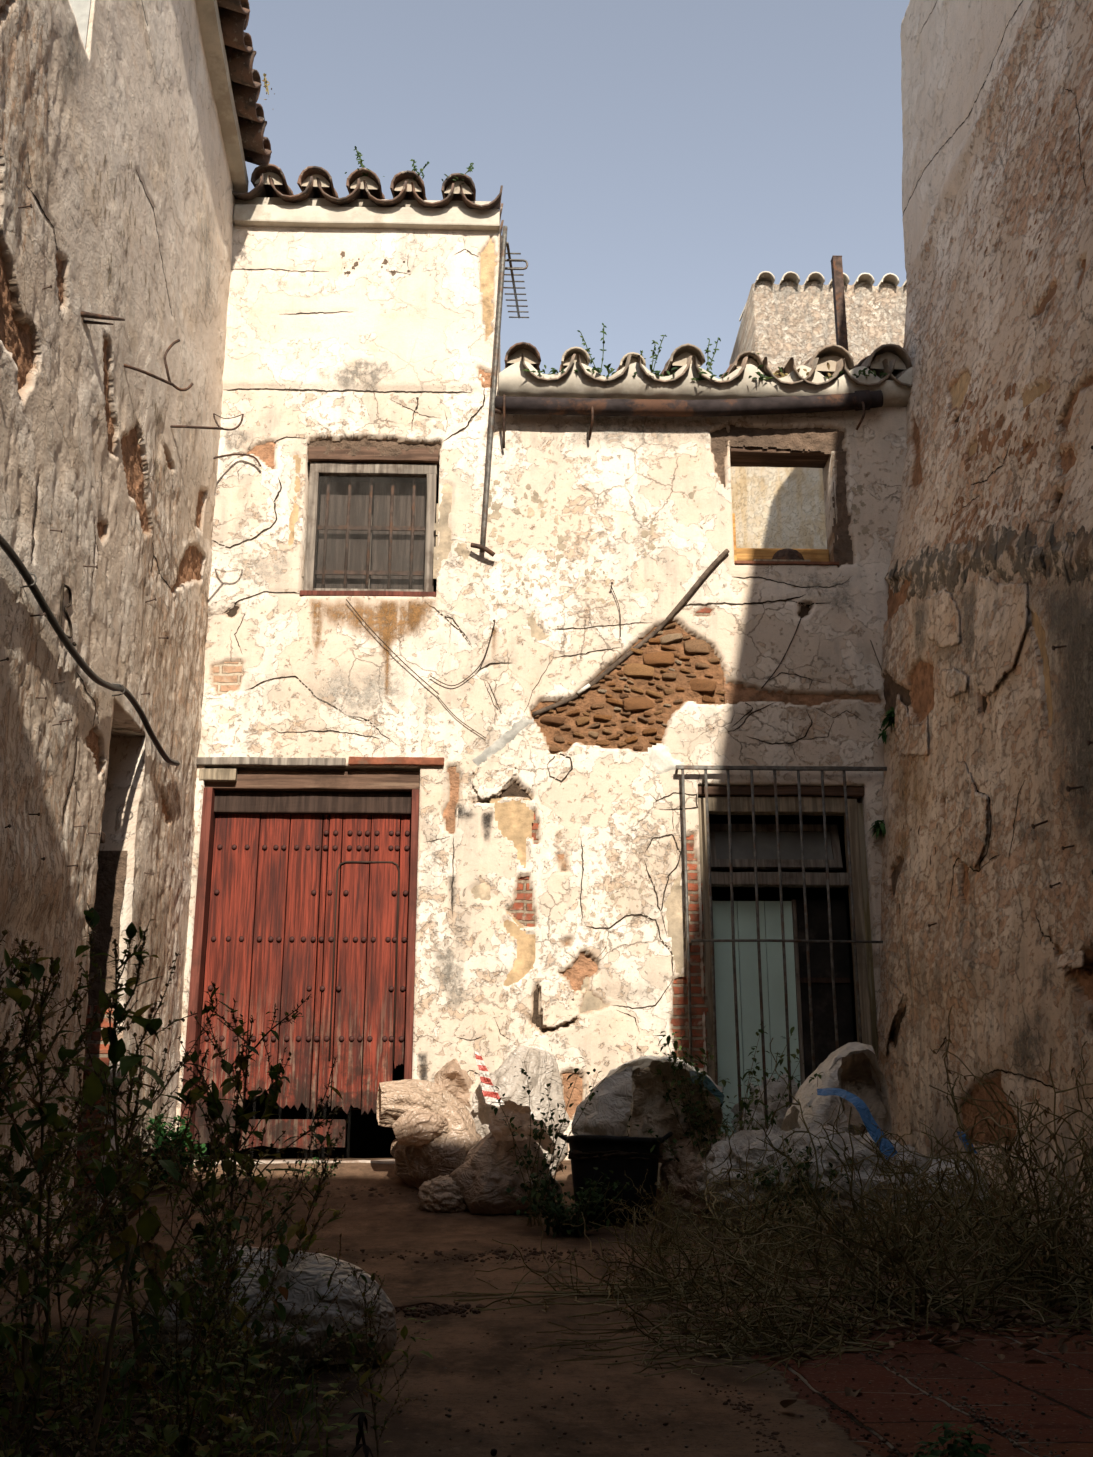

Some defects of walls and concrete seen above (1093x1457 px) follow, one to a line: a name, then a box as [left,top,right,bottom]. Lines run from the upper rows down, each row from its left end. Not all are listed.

spalling [103,340,171,533]
crack [213,436,301,552]
crack [223,388,485,441]
crack [222,591,392,742]
peeling [584,568,615,605]
crack [427,576,851,712]
spalling [531,607,935,757]
peeling [887,576,1028,713]
spalling [443,754,609,1033]
spalling [592,835,710,1068]
spalling [961,1072,1017,1145]